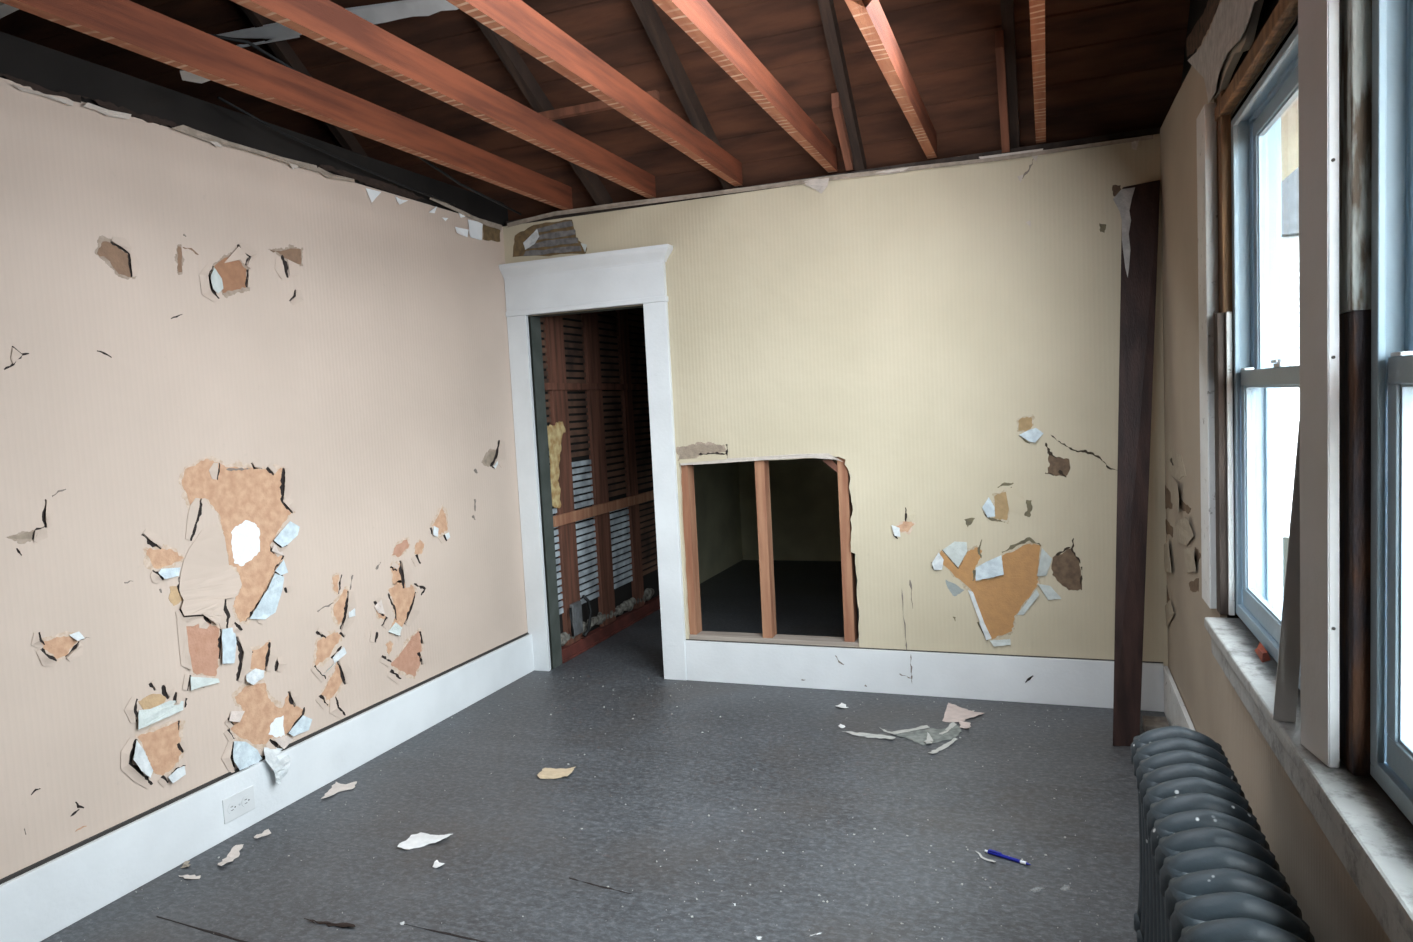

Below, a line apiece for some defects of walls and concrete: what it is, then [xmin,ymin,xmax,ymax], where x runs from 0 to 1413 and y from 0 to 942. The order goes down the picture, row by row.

spalling [0,73,1153,257]
peeling [95,235,140,280]
peeling [175,234,304,305]
peeling [676,442,728,463]
crack [1051,435,1115,470]
peeling [31,631,89,667]
peeling [121,456,357,789]
peeling [370,504,450,684]
peeling [931,482,1083,646]